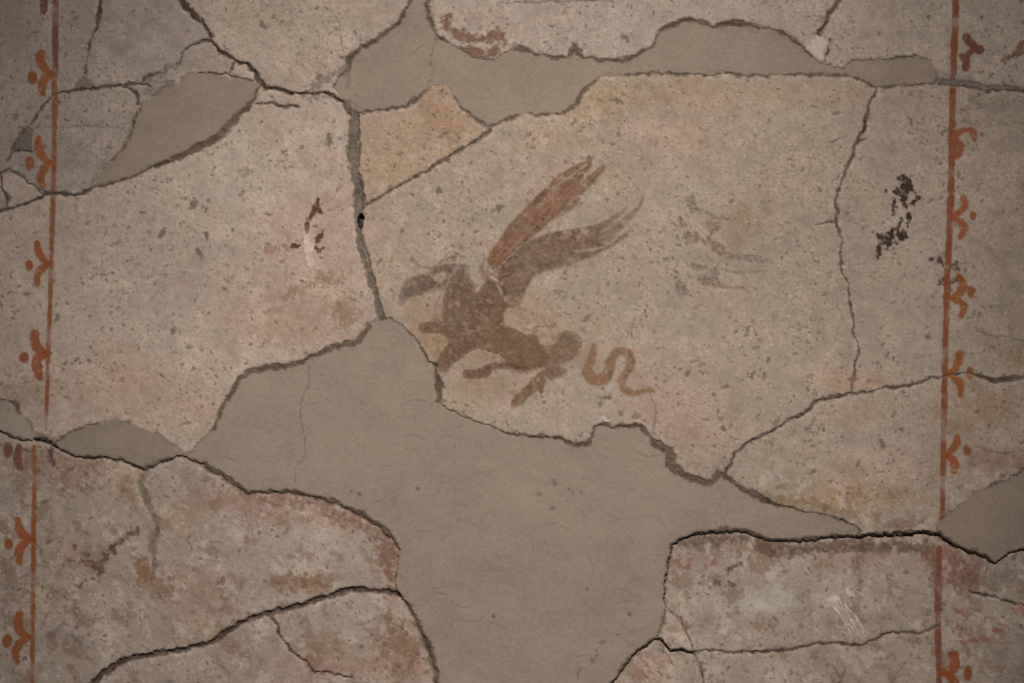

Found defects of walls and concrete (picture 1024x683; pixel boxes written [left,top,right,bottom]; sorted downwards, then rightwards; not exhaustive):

crack [496,0,614,8]
spalling [804,35,831,62]
crack [817,0,842,63]
crack [936,83,1024,95]
crack [0,152,93,214]
crack [31,0,492,322]
leakage [873,172,923,261]
crack [724,87,1024,477]
crack [136,455,173,585]
crack [856,531,953,548]
crack [91,587,404,683]
crack [656,608,935,683]